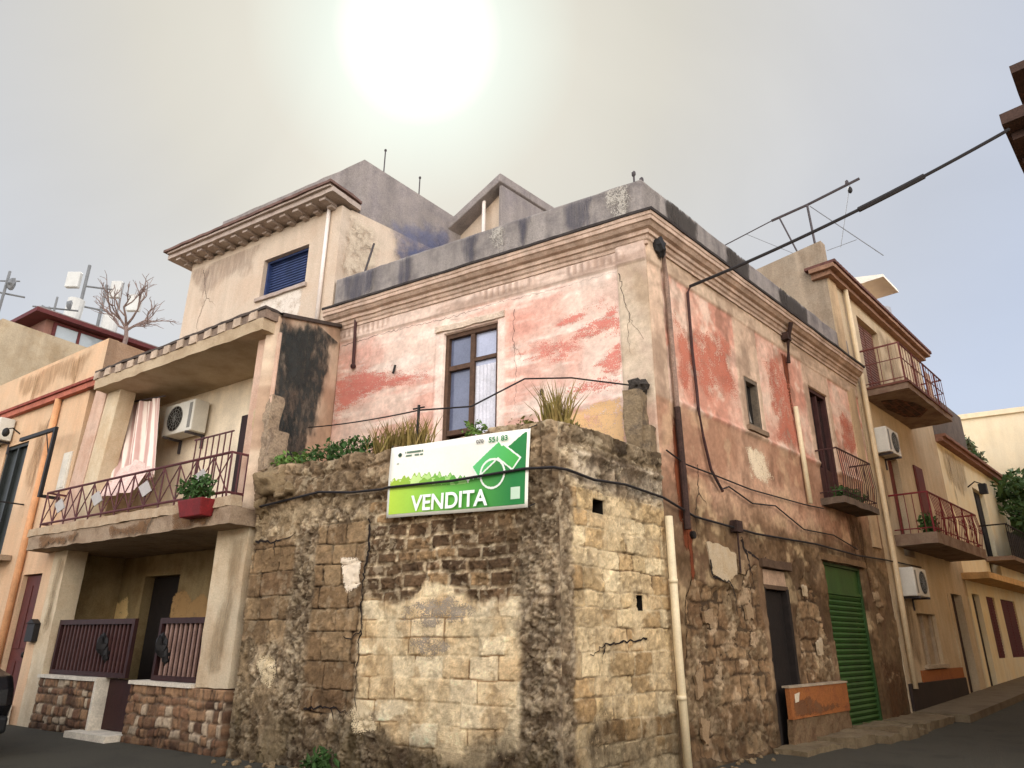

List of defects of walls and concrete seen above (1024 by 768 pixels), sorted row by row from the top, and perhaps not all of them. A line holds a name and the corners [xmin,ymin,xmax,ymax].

damp [341,212,381,298]
damp [395,225,447,283]
damp [667,200,698,240]
damp [274,322,428,463]
corrosion [672,417,695,580]
flaking render [169,590,208,618]
crack [303,518,371,721]
crack [590,637,647,665]
flaking render [685,541,780,763]
flaking render [794,577,847,718]